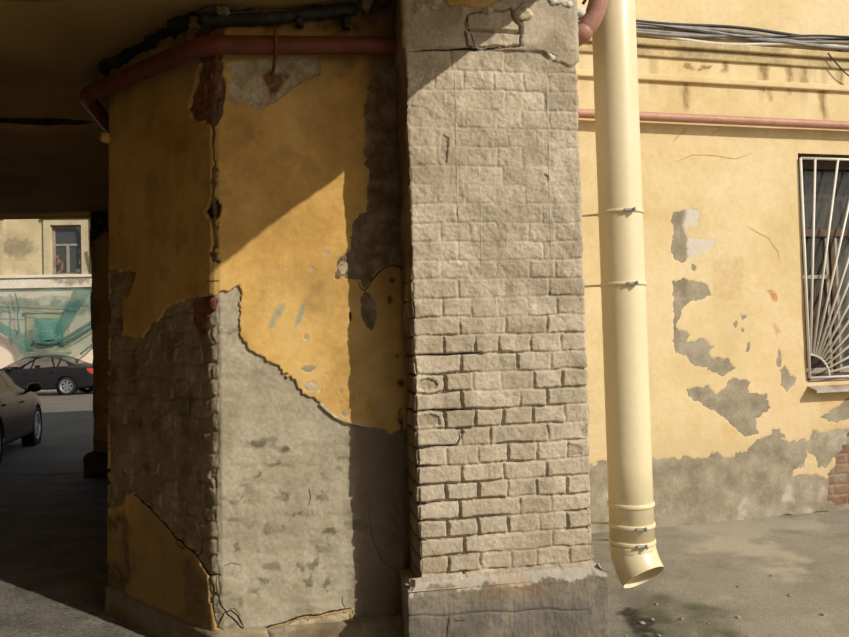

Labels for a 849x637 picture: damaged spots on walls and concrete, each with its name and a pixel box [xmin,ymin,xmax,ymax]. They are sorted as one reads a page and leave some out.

flaking render [464,10,520,48]
flaking render [190,55,320,125]
flaking render [334,59,402,330]
peeling [671,208,771,437]
peeling [776,349,796,392]
peeling [820,397,849,423]
flaking render [108,269,411,630]
flaking render [827,433,849,507]
crack [130,492,244,629]
crack [265,597,355,637]